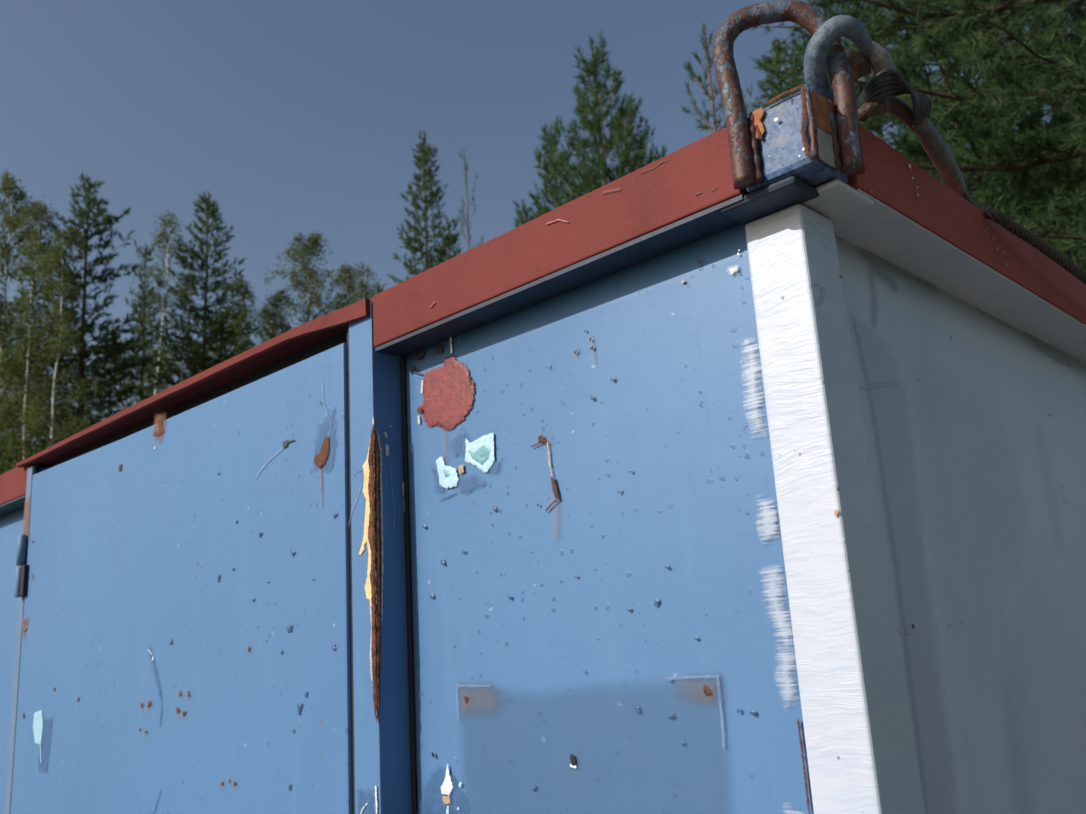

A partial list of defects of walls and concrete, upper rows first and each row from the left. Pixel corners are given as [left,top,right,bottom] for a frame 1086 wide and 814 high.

corrosion [752,85,836,168]
peeling [411,345,443,393]
peeling [433,432,498,499]
corrosion [537,477,559,511]
peeling [33,710,52,772]
peeling [358,785,378,814]
peeling [419,764,467,814]